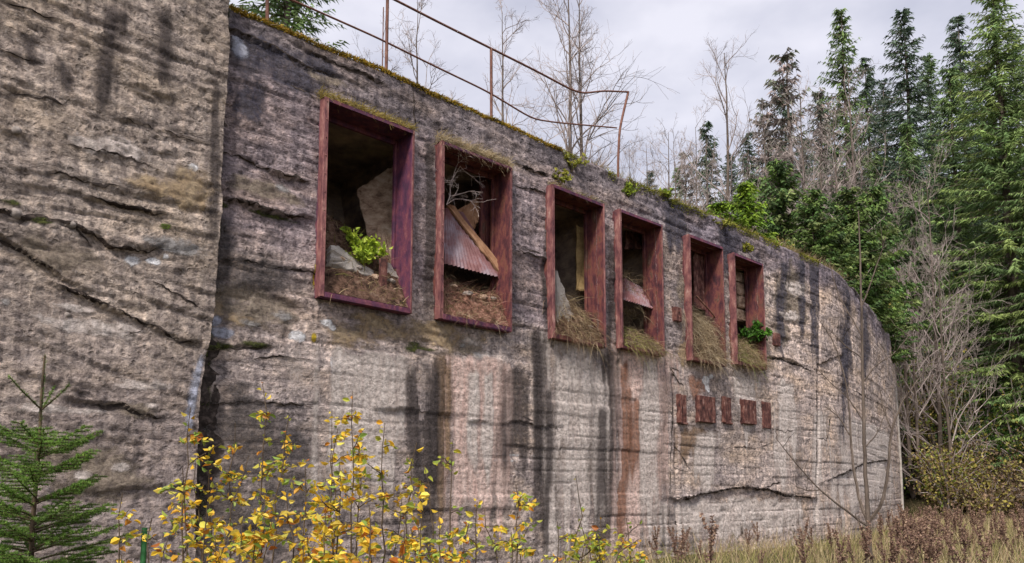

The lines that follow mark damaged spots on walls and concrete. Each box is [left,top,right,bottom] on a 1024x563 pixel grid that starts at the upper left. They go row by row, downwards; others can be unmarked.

water stain [96,9,127,107]
water stain [158,10,172,85]
crack [0,208,315,541]
water stain [186,143,896,563]
corrosion [616,363,640,548]
crack [668,286,893,526]